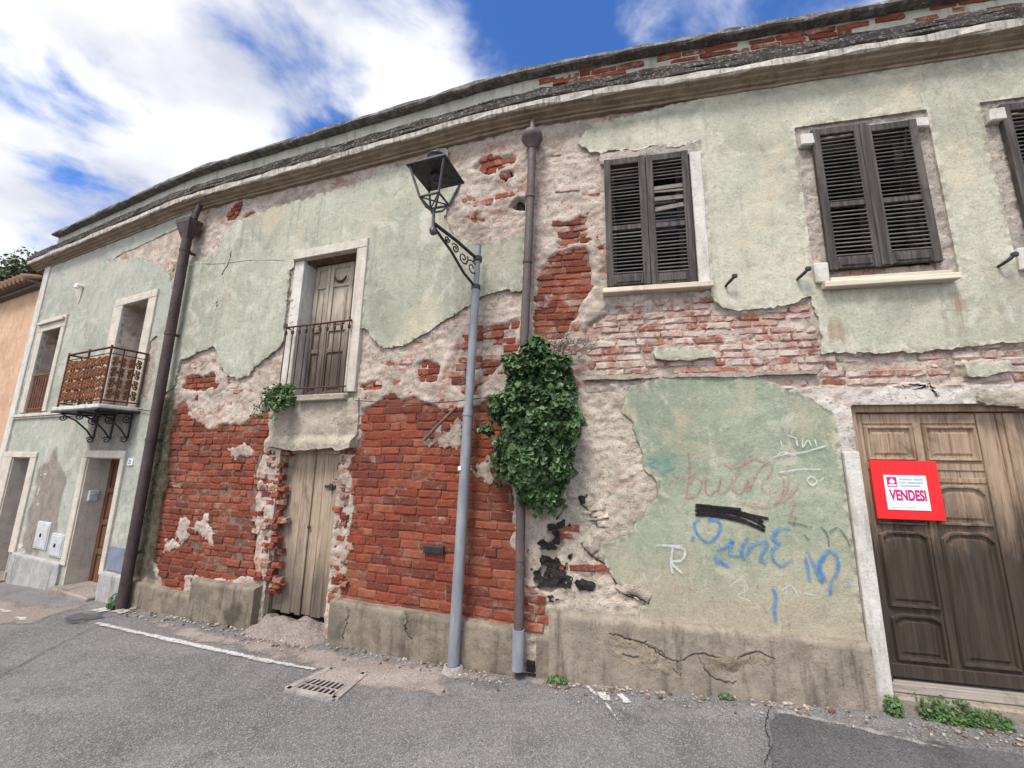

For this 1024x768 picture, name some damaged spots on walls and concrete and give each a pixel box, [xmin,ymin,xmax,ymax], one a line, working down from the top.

flaking render [114,152,429,284]
crack [170,250,294,309]
flaking render [285,269,296,327]
flaking render [323,108,1024,678]
flaking render [133,336,294,623]
crack [403,610,413,640]
crack [606,631,776,684]